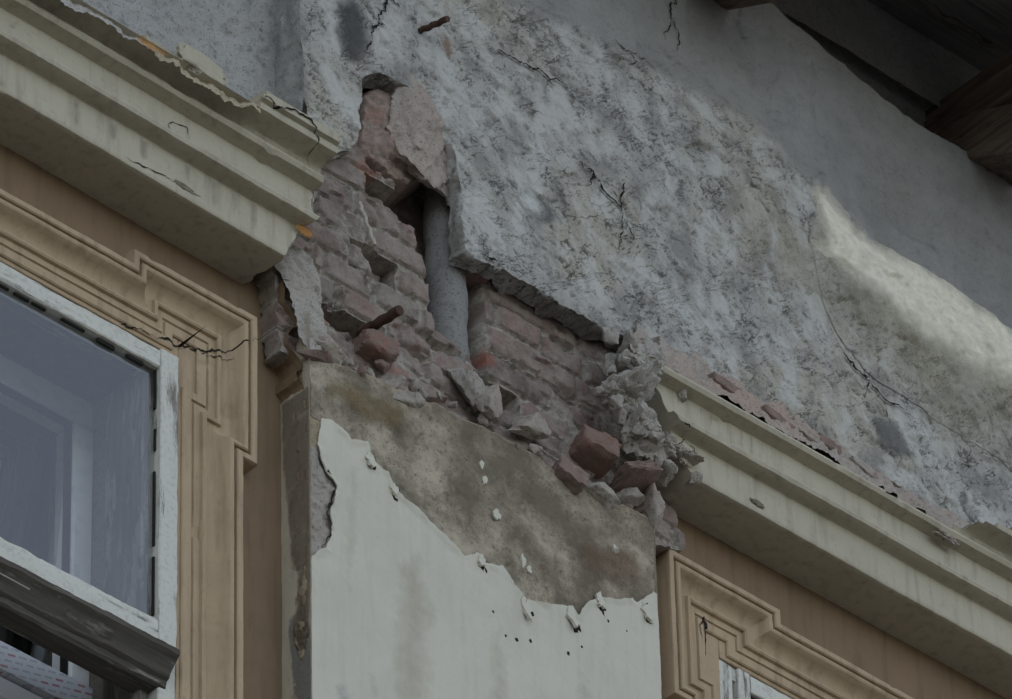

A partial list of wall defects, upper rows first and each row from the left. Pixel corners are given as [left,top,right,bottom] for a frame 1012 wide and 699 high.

crack [363,0,401,62]
crack [664,0,680,50]
flaking render [173,42,227,86]
crack [121,323,275,360]
spalling [255,75,704,633]
crack [844,353,911,417]